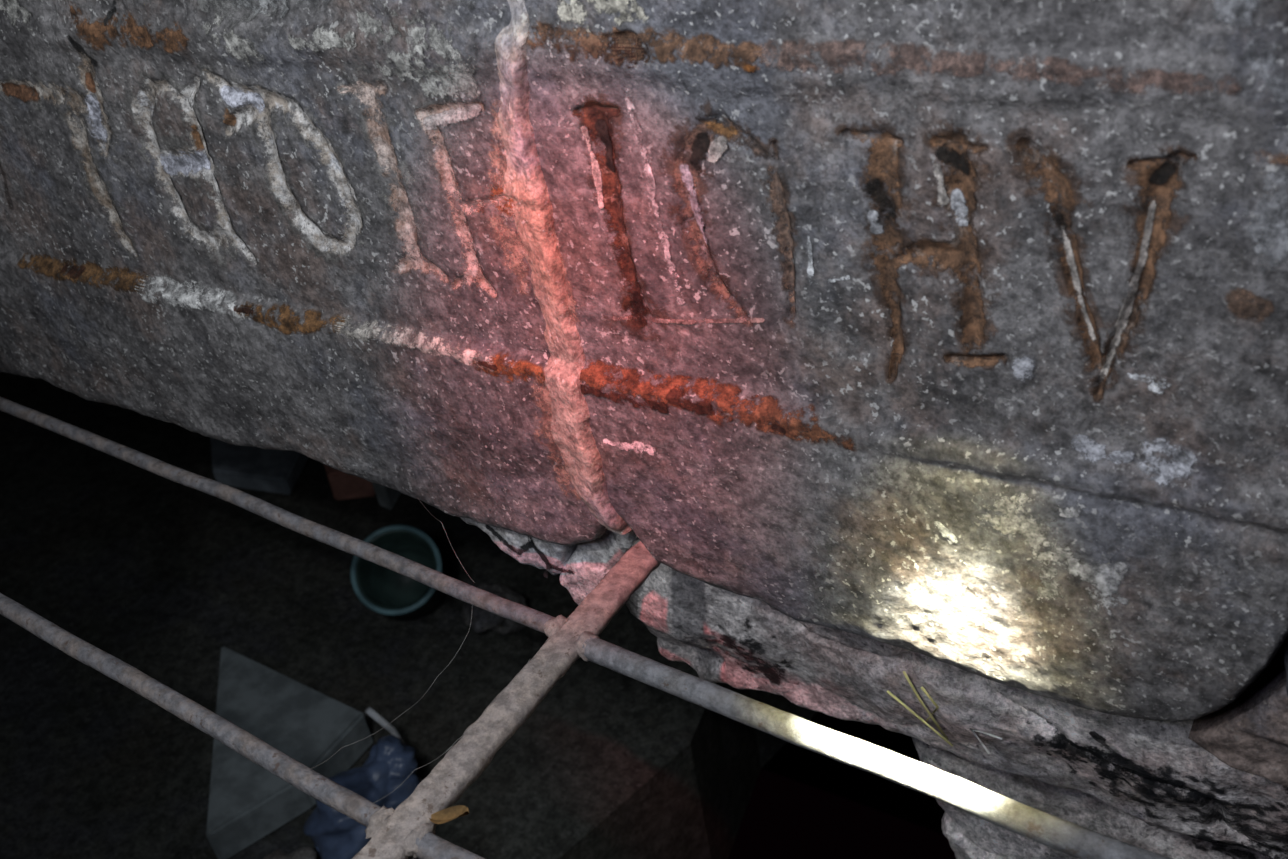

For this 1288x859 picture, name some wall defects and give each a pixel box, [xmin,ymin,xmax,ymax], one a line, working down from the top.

corrosion [69,5,189,53]
corrosion [526,21,1241,95]
corrosion [17,253,150,293]
crack [489,0,632,535]
corrosion [234,301,345,335]
corrosion [472,354,545,383]
corrosion [579,360,855,451]